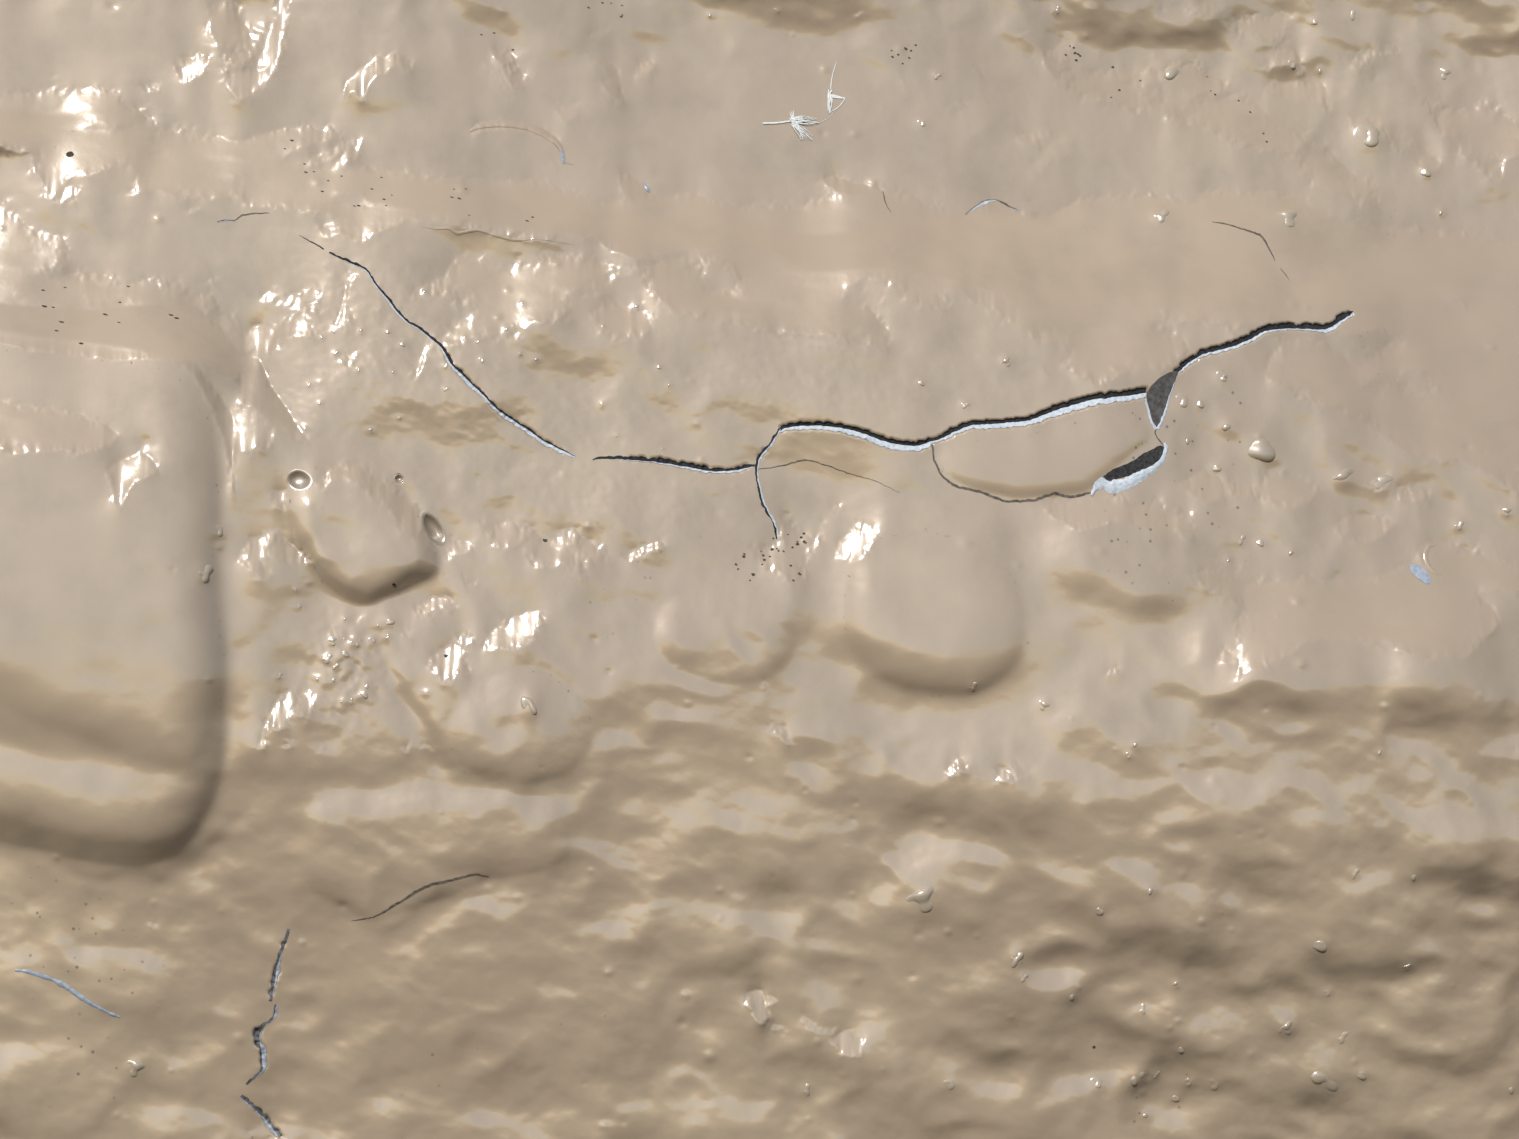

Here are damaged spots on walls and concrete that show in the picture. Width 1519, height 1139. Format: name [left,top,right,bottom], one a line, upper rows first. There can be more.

crack [217,212,267,222]
crack [299,235,1353,539]
peeling [939,371,1178,497]
peeling [1409,564,1431,584]
crack [240,929,290,1137]